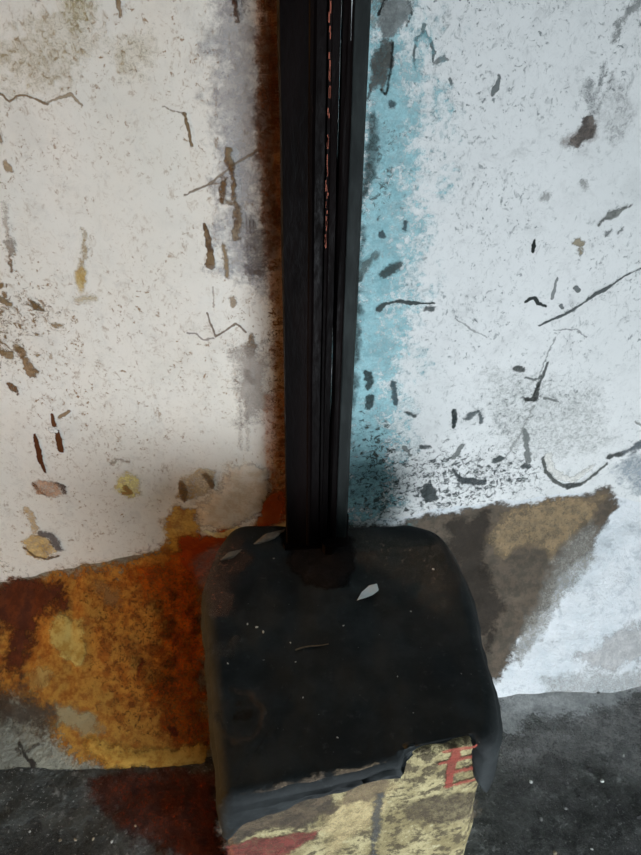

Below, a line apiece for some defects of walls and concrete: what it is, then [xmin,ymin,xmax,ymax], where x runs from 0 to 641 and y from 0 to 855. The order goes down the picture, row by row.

spalling [367,0,413,99]
water stain [612,0,641,43]
spalling [563,115,596,148]
corrosion [255,0,286,526]
water stain [348,3,619,680]
crack [524,268,641,385]
spalling [164,469,240,553]
corrosion [0,529,228,855]